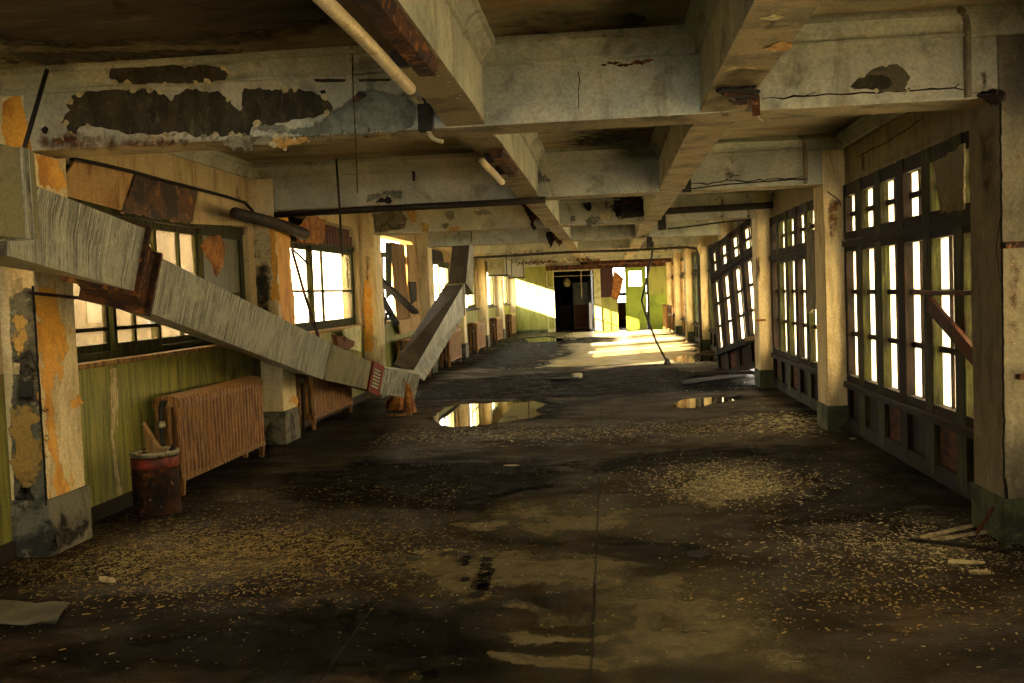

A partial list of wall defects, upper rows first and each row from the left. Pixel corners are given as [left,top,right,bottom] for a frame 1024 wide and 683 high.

peeling [1,96,67,192]
flaking render [60,64,391,151]
crack [692,175,804,185]
peeling [850,61,910,93]
crack [762,84,1008,499]
peeling [8,278,74,499]